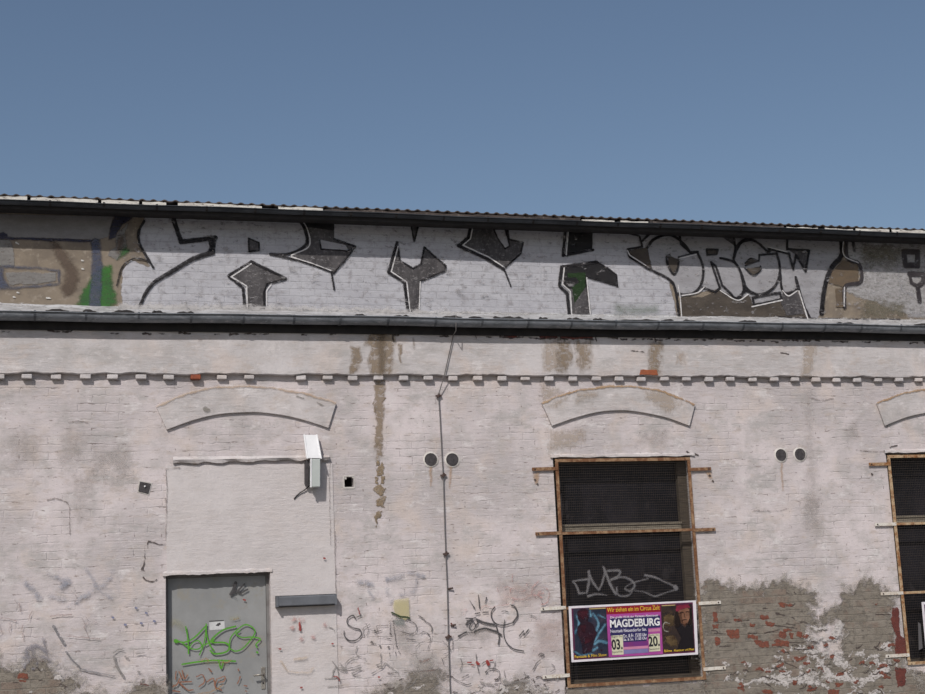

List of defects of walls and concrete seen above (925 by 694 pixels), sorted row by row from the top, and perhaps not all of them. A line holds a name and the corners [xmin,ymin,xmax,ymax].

damp [546,341,591,371]
damp [350,334,402,527]
spalling [470,573,925,694]
spalling [0,652,107,694]
spalling [119,676,168,694]
spalling [369,658,458,694]